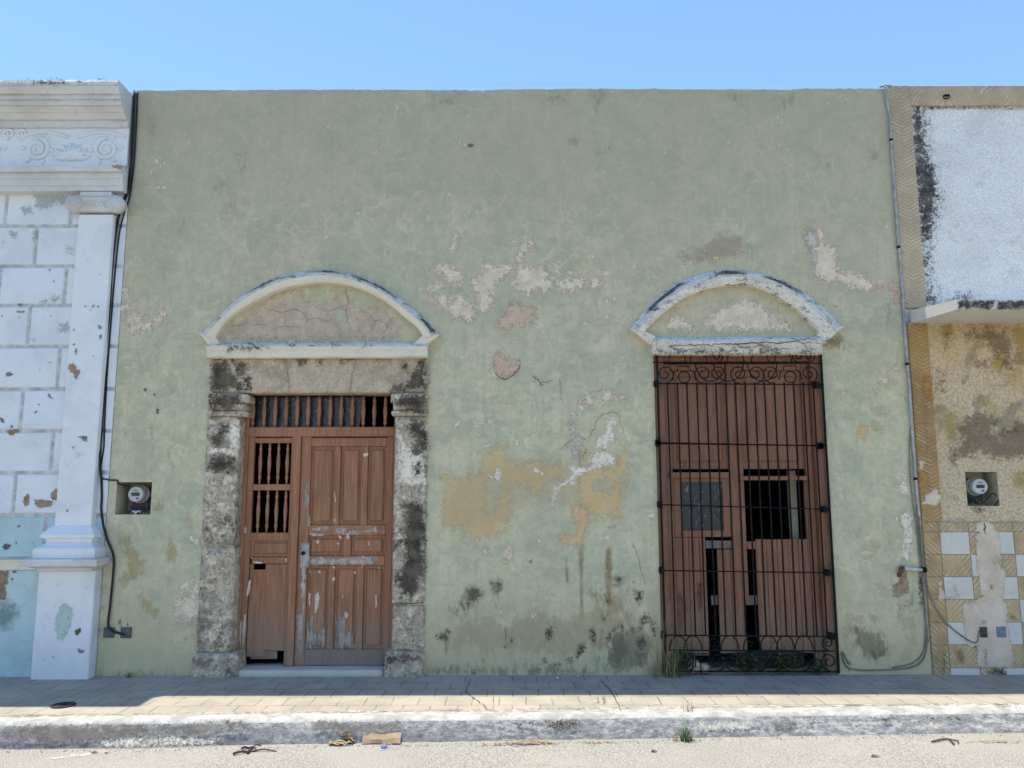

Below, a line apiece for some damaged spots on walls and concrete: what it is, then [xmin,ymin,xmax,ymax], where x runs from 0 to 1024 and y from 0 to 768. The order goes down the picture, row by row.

damp [912,106,1012,305]
crack [231,295,388,339]
peeling [426,232,617,343]
peeling [667,297,794,334]
damp [205,343,269,475]
peeling [531,388,628,509]
damp [950,411,1024,465]
spalling [20,488,58,508]
peeling [891,461,954,598]
spalling [0,570,16,600]
damp [466,588,481,604]
damp [617,577,656,650]